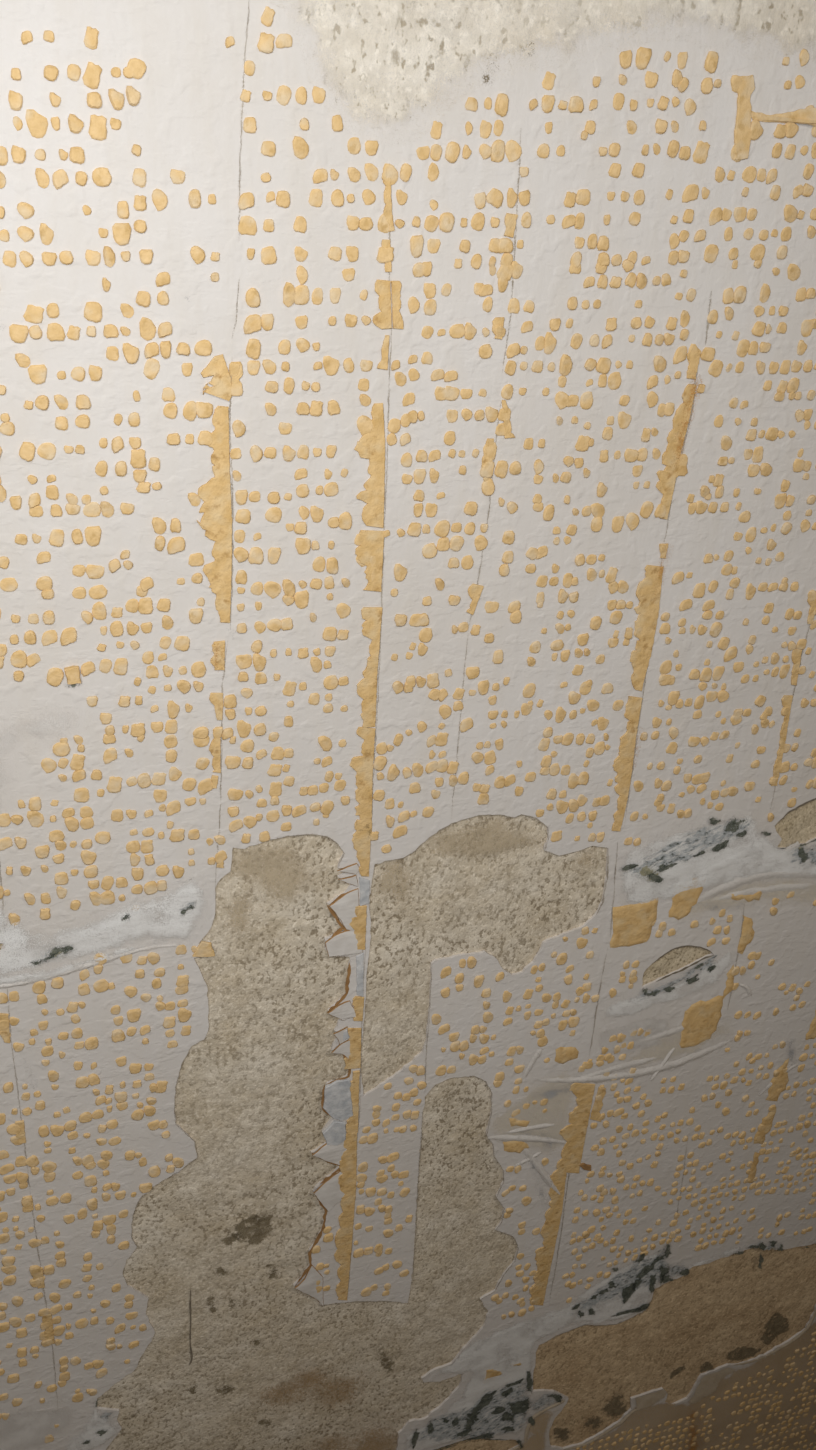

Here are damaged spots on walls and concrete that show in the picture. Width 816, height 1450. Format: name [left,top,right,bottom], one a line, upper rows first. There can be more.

peeling [734,75,816,160]
leakage [197,354,243,670]
leakage [656,351,701,520]
leakage [0,835,344,985]
leakage [209,693,223,789]
leakage [612,543,668,831]
peeling [642,945,714,986]
leakage [615,812,816,910]
peeling [775,798,816,849]
peeling [97,814,703,1450]
leakage [217,1082,816,1450]
peeling [483,1244,816,1447]